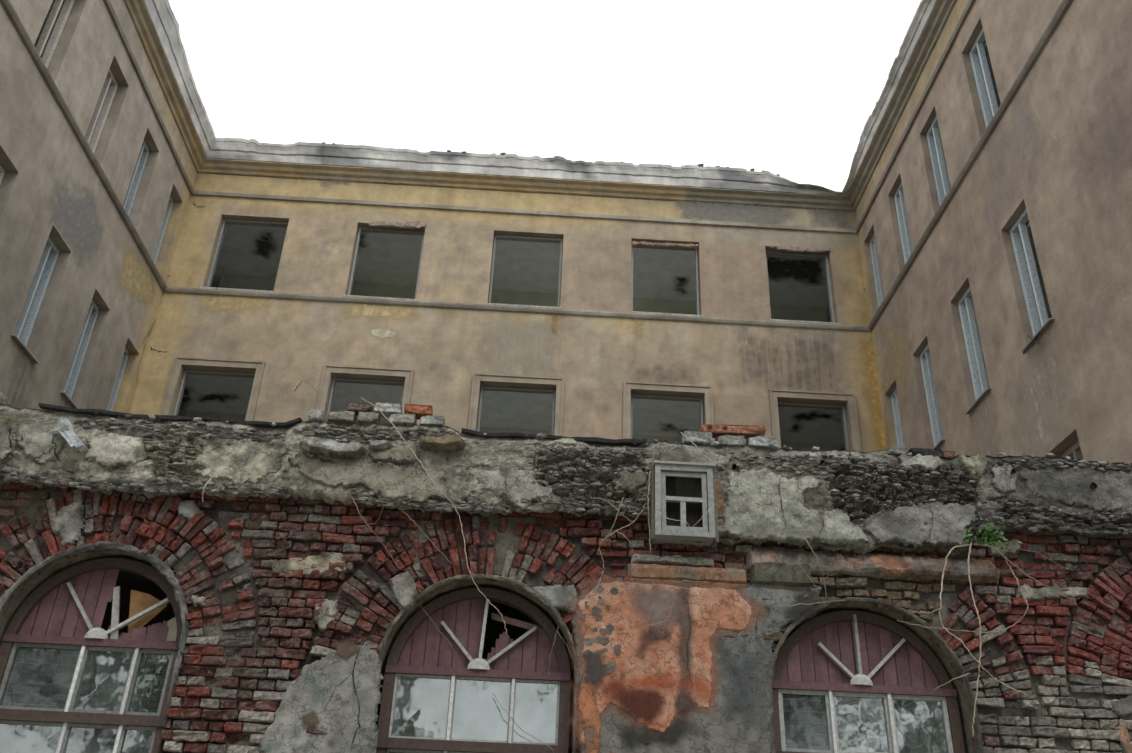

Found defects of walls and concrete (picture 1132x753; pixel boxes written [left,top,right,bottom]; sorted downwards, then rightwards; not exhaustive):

peeling [0,418,1132,548]
crack [325,648,361,748]
peeling [532,581,822,753]